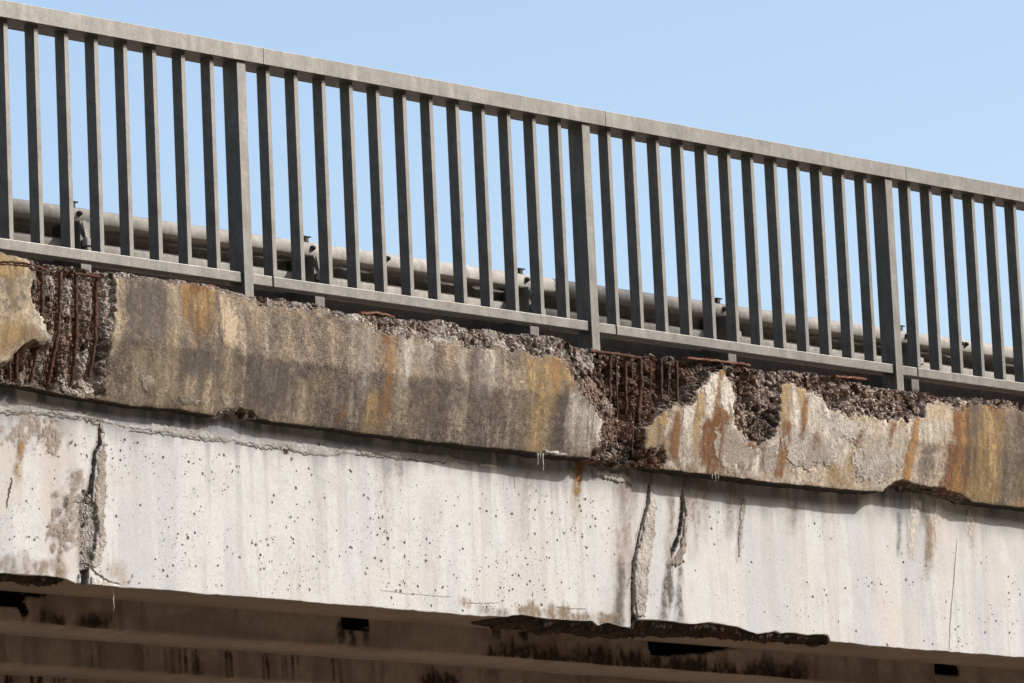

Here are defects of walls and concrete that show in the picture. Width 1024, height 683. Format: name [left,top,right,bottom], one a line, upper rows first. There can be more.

water stain [111,278,311,422]
crack [73,419,119,584]
spalling [0,259,1024,656]
crack [627,473,652,623]
water stain [660,563,683,621]
crack [670,477,685,573]
corrosion [649,357,751,474]
water stain [663,373,780,477]
corrosion [775,383,818,478]
water stain [789,386,849,467]
corrosion [891,418,921,481]
corrosion [938,403,1004,504]